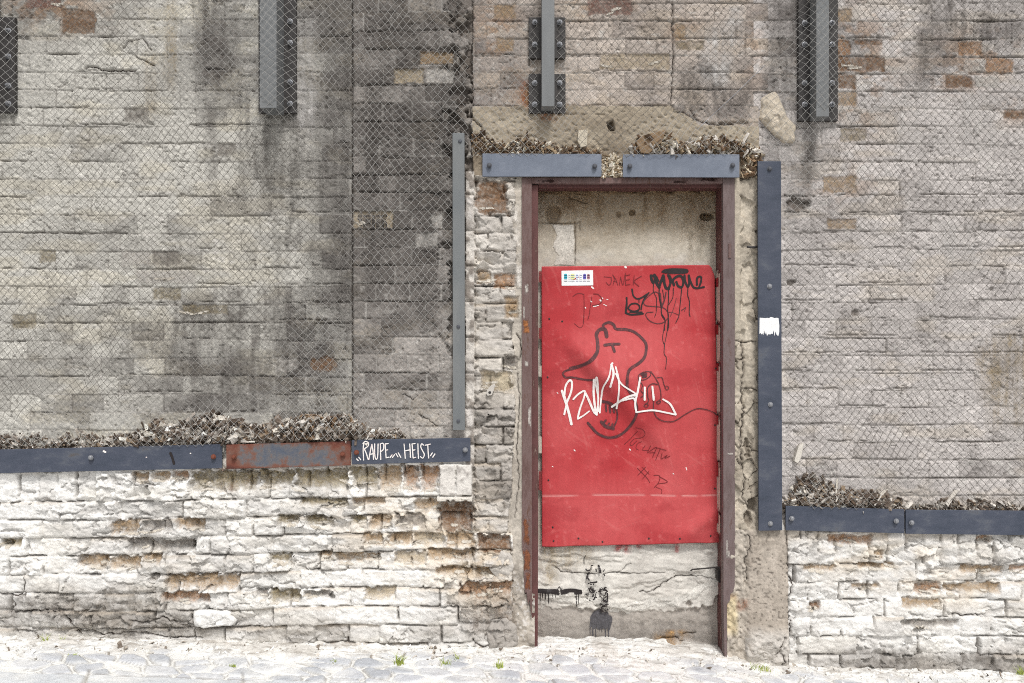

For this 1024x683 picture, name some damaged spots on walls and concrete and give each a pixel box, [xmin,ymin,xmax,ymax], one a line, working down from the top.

spalling [466,181,542,317]
crack [739,341,757,503]
spalling [81,517,205,570]
spalling [136,464,512,604]
spalling [829,534,869,547]
spalling [858,550,898,571]
spalling [902,564,1024,629]